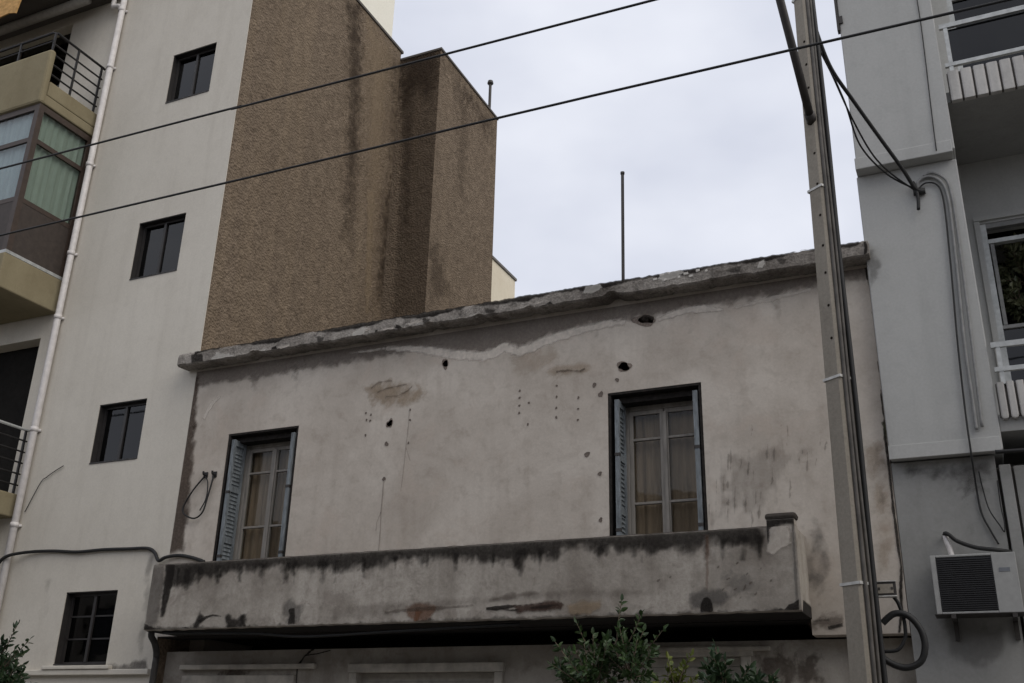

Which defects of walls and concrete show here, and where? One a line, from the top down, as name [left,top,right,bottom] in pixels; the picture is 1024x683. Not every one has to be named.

water stain [406,54,434,94]
peeling [653,269,707,281]
peeling [360,289,810,370]
spalling [615,361,632,382]
water stain [151,249,817,630]
peeling [768,526,789,553]